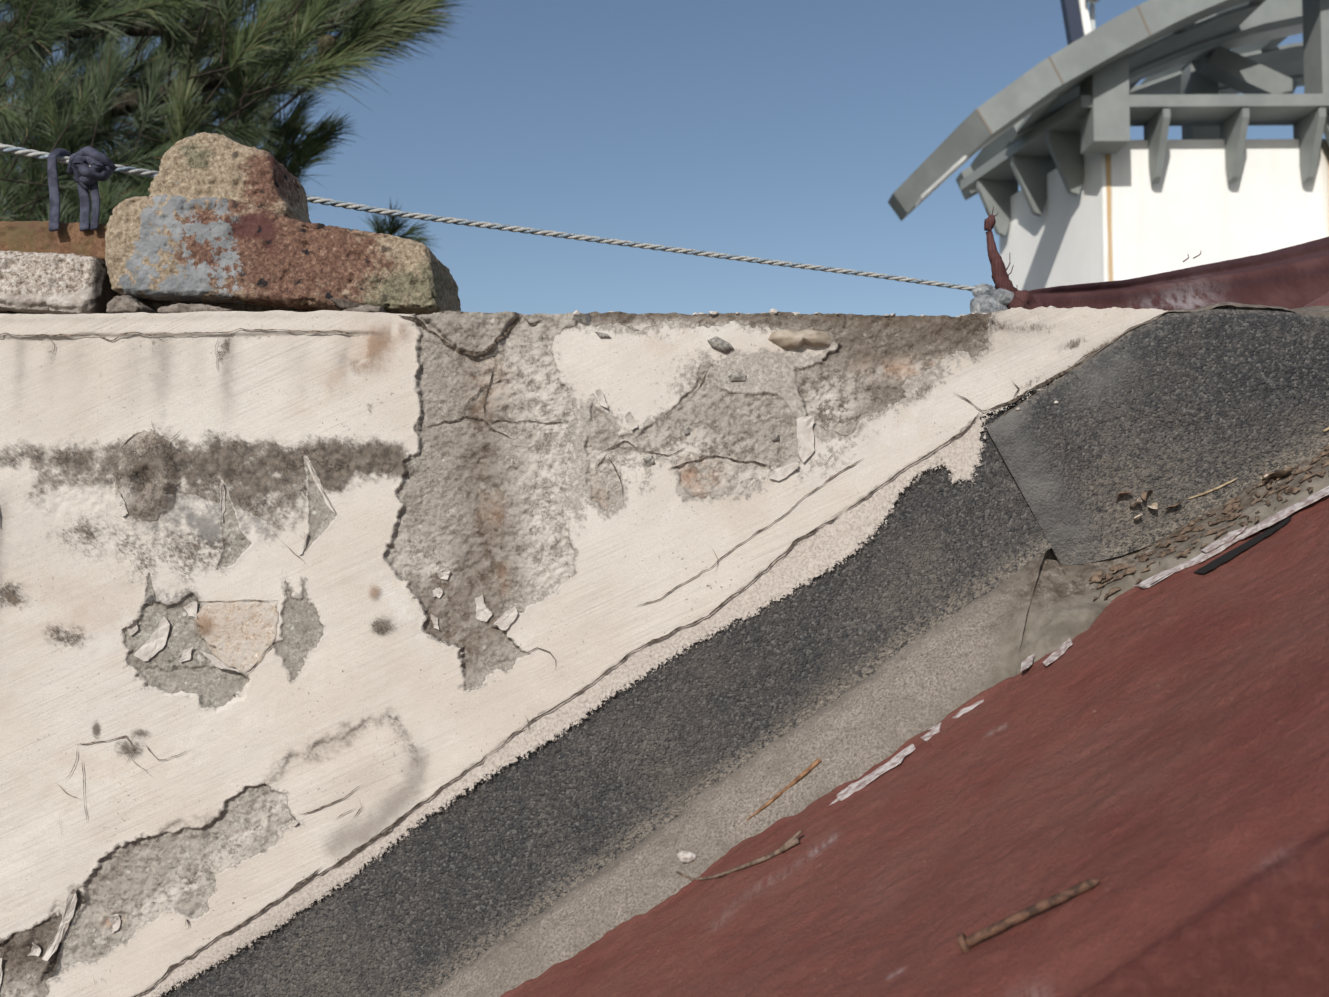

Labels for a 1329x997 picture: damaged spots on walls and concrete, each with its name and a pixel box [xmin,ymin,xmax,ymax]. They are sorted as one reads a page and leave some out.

crack [399,315,561,439]
leakage [0,431,409,530]
spalling [383,311,994,692]
spalling [122,573,324,708]
crack [133,349,1100,997]
crack [56,735,188,828]
spalling [0,784,298,997]